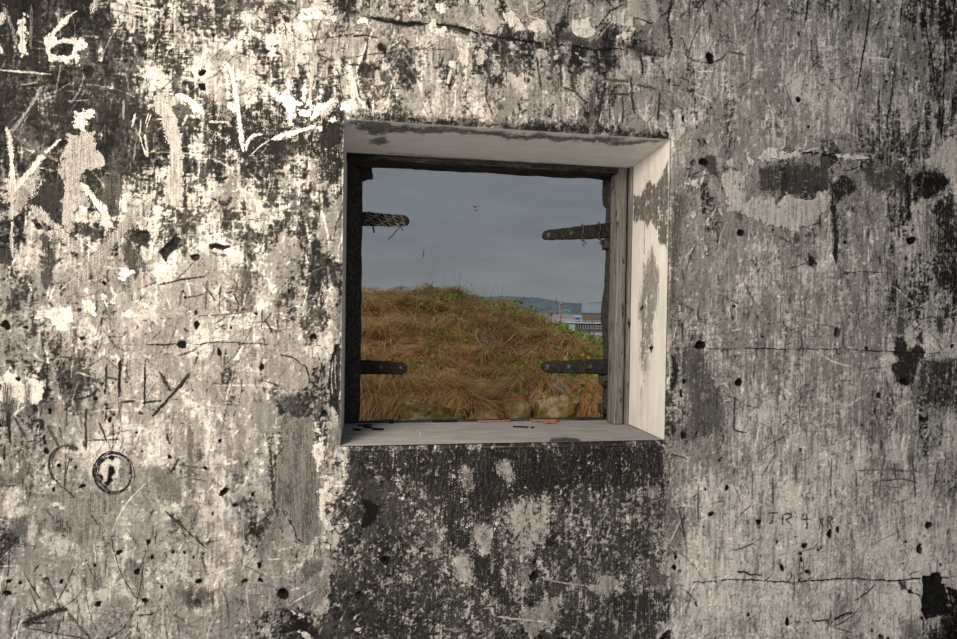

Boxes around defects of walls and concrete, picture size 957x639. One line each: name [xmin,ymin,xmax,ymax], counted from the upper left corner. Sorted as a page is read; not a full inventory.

water stain [666,185,690,328]
water stain [758,160,840,263]
water stain [668,340,728,448]
peeling [11,484,121,548]
water stain [321,437,677,639]
water stain [277,605,307,638]
crack [692,571,950,628]
spalling [898,563,957,635]